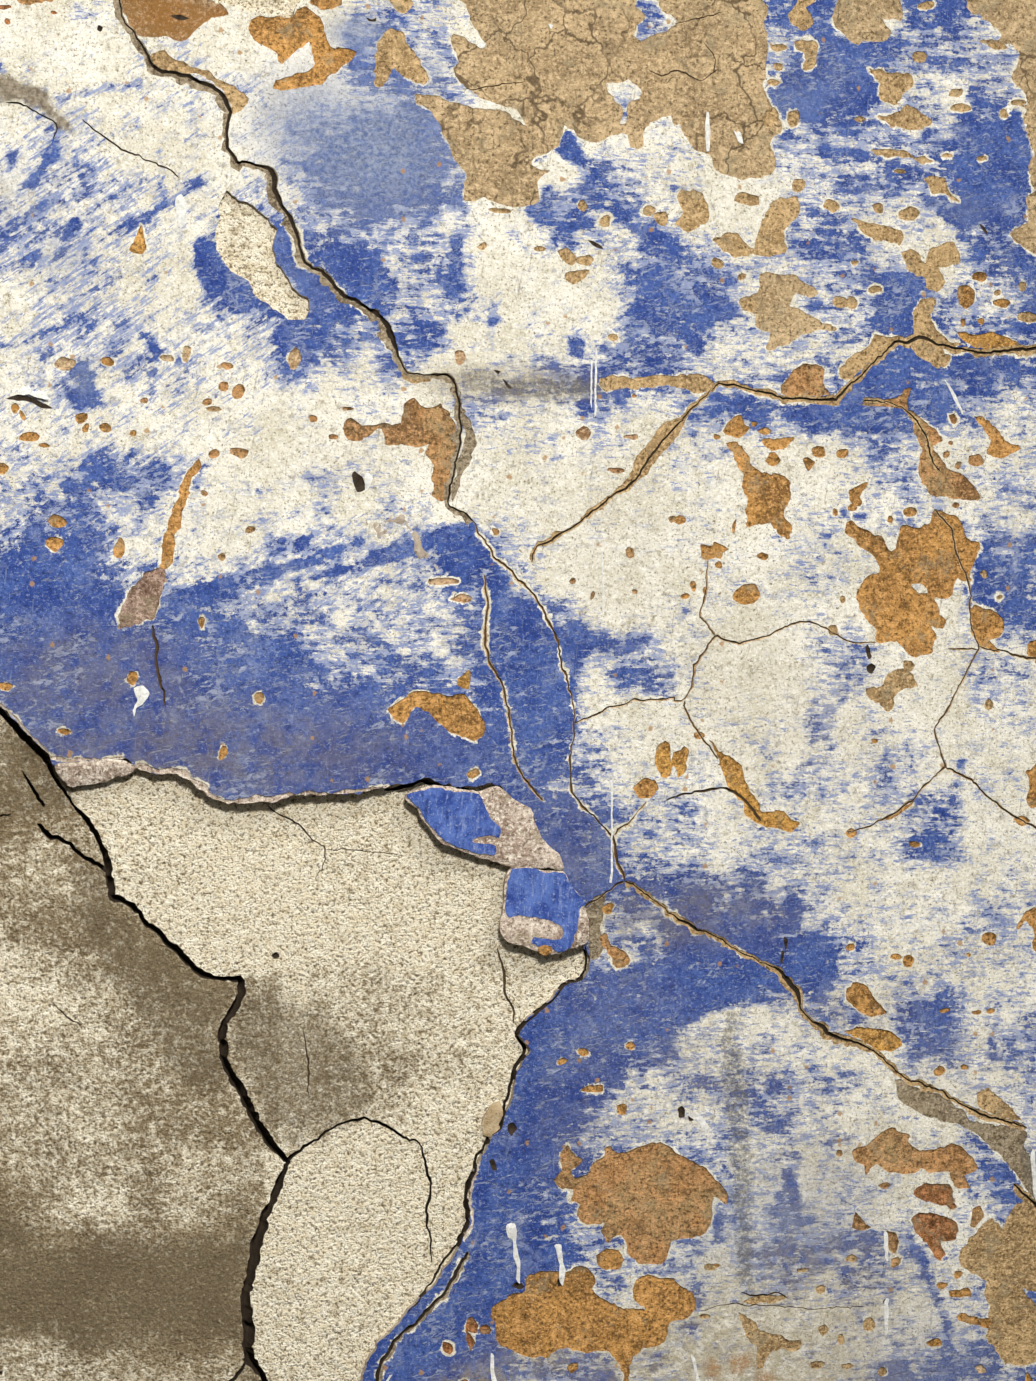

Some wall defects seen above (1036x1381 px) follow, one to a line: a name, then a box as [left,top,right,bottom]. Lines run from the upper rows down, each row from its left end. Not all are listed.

crack [6,102,179,178]
peeling [374,0,882,350]
crack [113,0,1036,1131]
peeling [700,415,794,569]
peeling [833,388,1020,712]
crack [0,708,588,1381]
flaking render [0,682,630,1381]
water stain [0,1226,246,1345]
peeling [442,1142,728,1381]
crack [701,1292,863,1311]
peeling [836,1079,1036,1381]
crack [1013,1183,1036,1219]